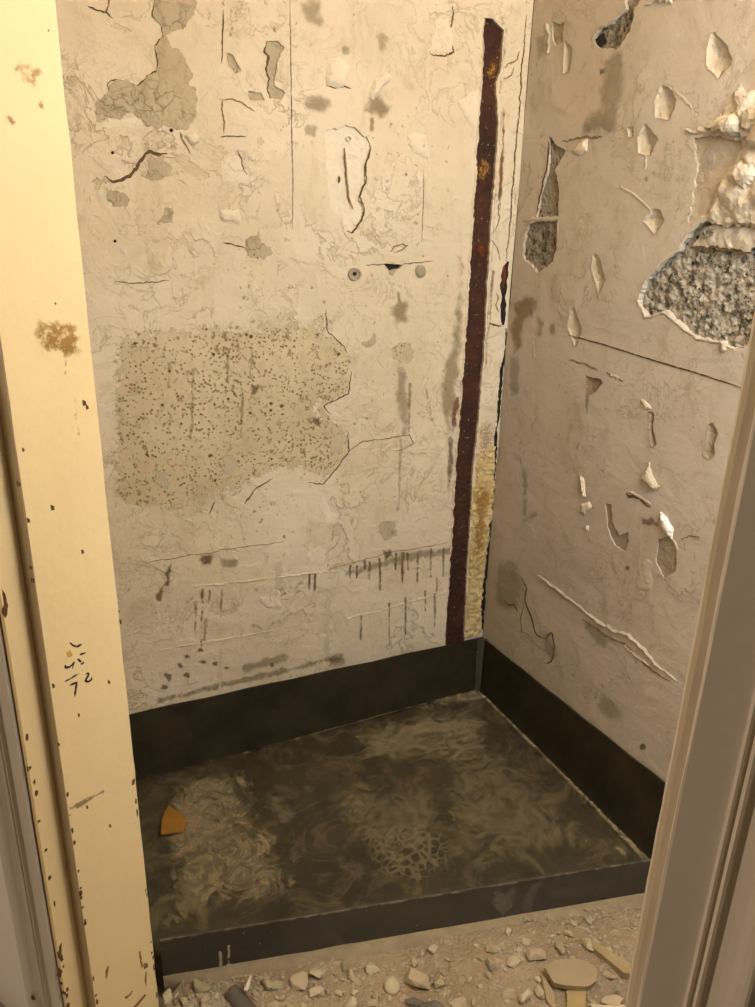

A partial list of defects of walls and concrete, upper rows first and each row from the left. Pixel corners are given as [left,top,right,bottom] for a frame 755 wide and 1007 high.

flaking render [95,0,198,130]
flaking render [249,41,284,101]
spalling [592,0,640,49]
crack [104,98,259,186]
spalling [525,138,566,301]
spalling [637,128,755,353]
rust [38,323,77,354]
rust [348,18,508,645]
crack [480,15,555,664]
crack [348,435,414,452]
water stain [159,589,337,702]
crack [583,618,670,681]